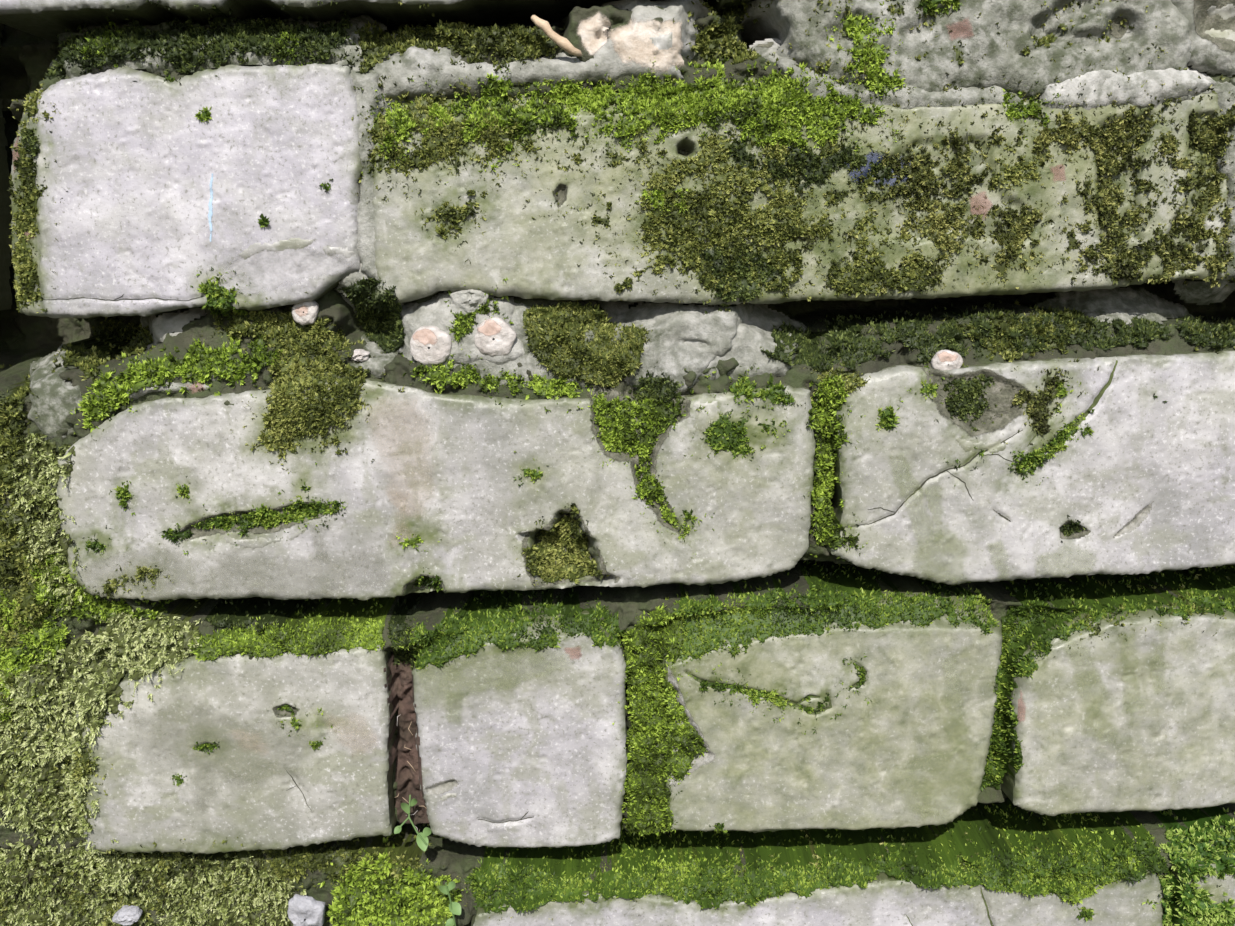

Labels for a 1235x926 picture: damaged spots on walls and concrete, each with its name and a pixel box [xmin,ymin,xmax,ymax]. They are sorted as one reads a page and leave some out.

crack [845,360,1118,527]